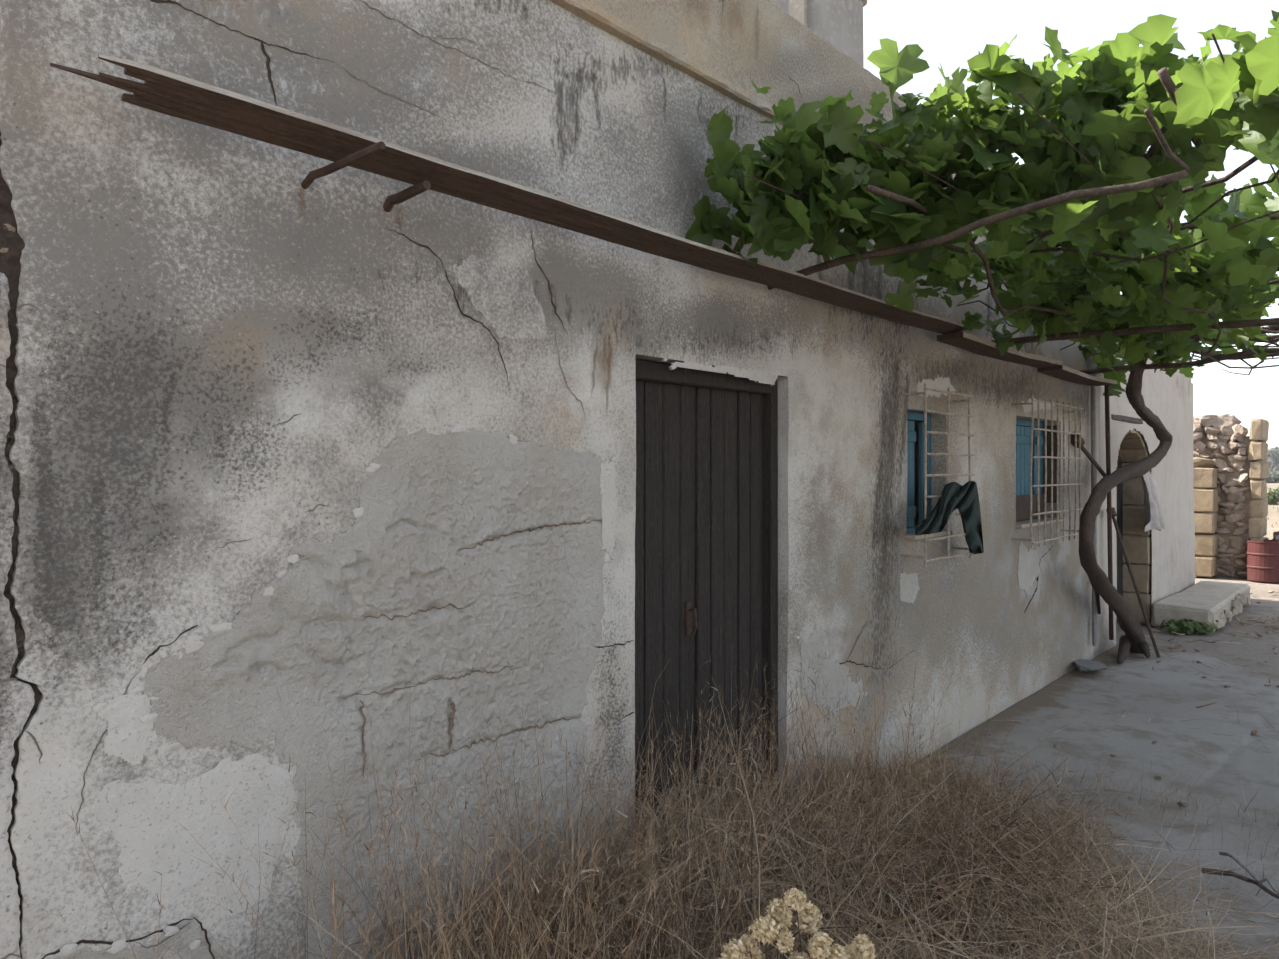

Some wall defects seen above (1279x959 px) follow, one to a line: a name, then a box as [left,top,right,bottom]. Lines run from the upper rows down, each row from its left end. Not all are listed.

crack [150,0,446,120]
crack [359,0,556,94]
crack [386,227,510,390]
crack [531,230,585,418]
crack [0,132,215,959]
flaking render [92,425,618,959]
flaking render [44,915,229,959]